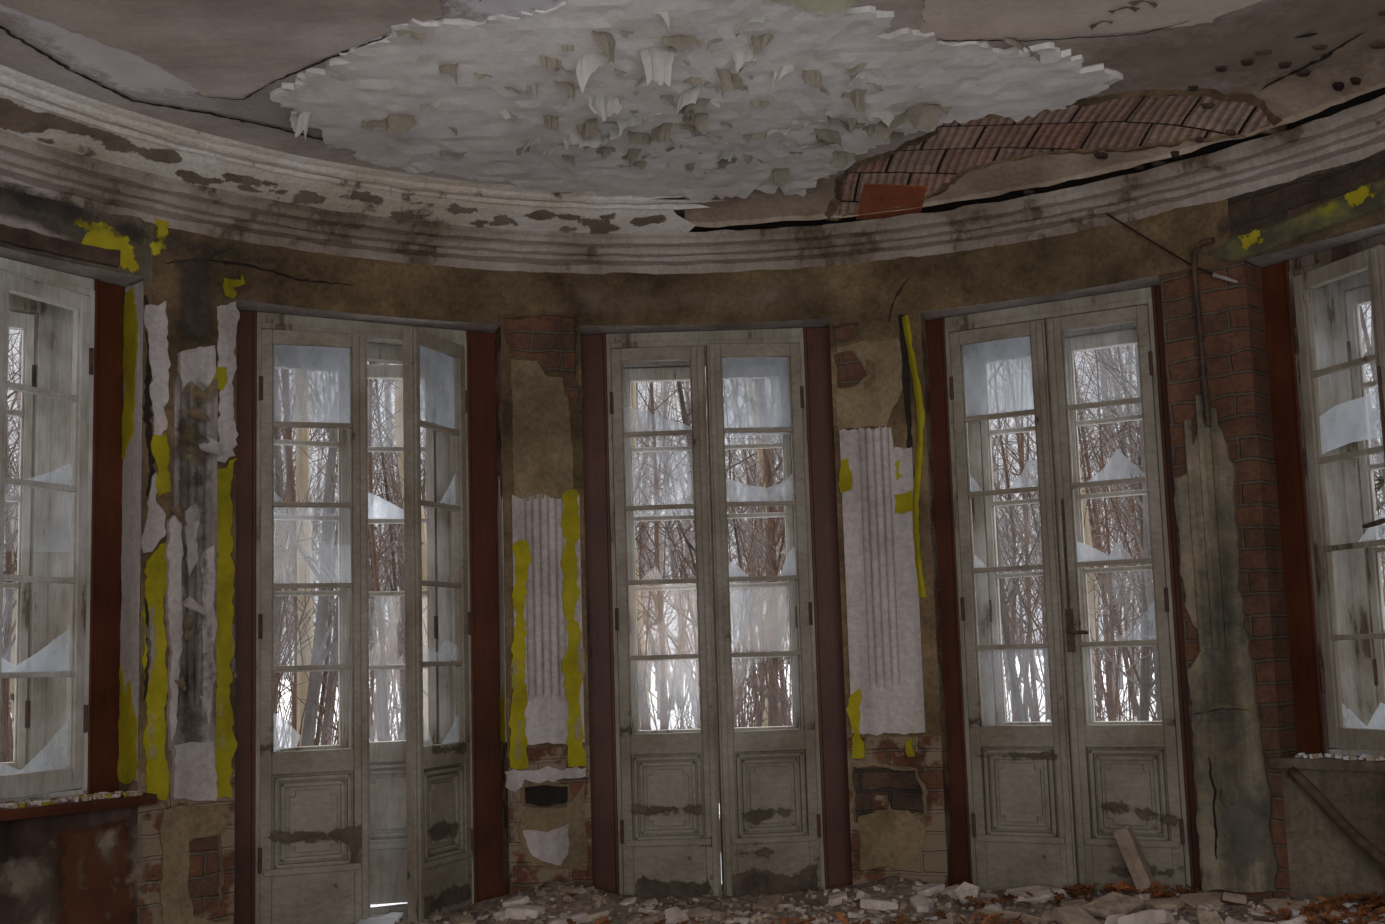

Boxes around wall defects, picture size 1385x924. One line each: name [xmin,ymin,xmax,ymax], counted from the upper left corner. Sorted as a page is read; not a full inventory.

leakage [0,4,199,97]
peeling [0,0,1287,234]
flaking render [1332,77,1361,91]
leakage [0,183,91,235]
peeling [1239,229,1264,251]
leakage [1212,178,1385,262]
peeling [1344,185,1377,207]
flaking render [74,217,245,801]
peeling [838,458,853,494]
peeling [894,315,926,598]
peeling [497,477,587,866]
flaking render [846,688,928,823]